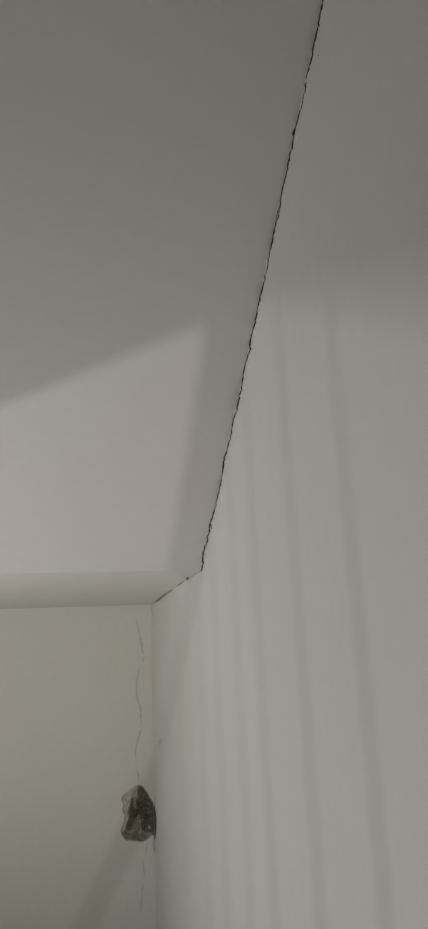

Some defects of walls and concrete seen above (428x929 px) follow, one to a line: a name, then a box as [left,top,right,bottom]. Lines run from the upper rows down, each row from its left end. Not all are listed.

crack [154,0,324,603]
spalling [120,785,156,842]